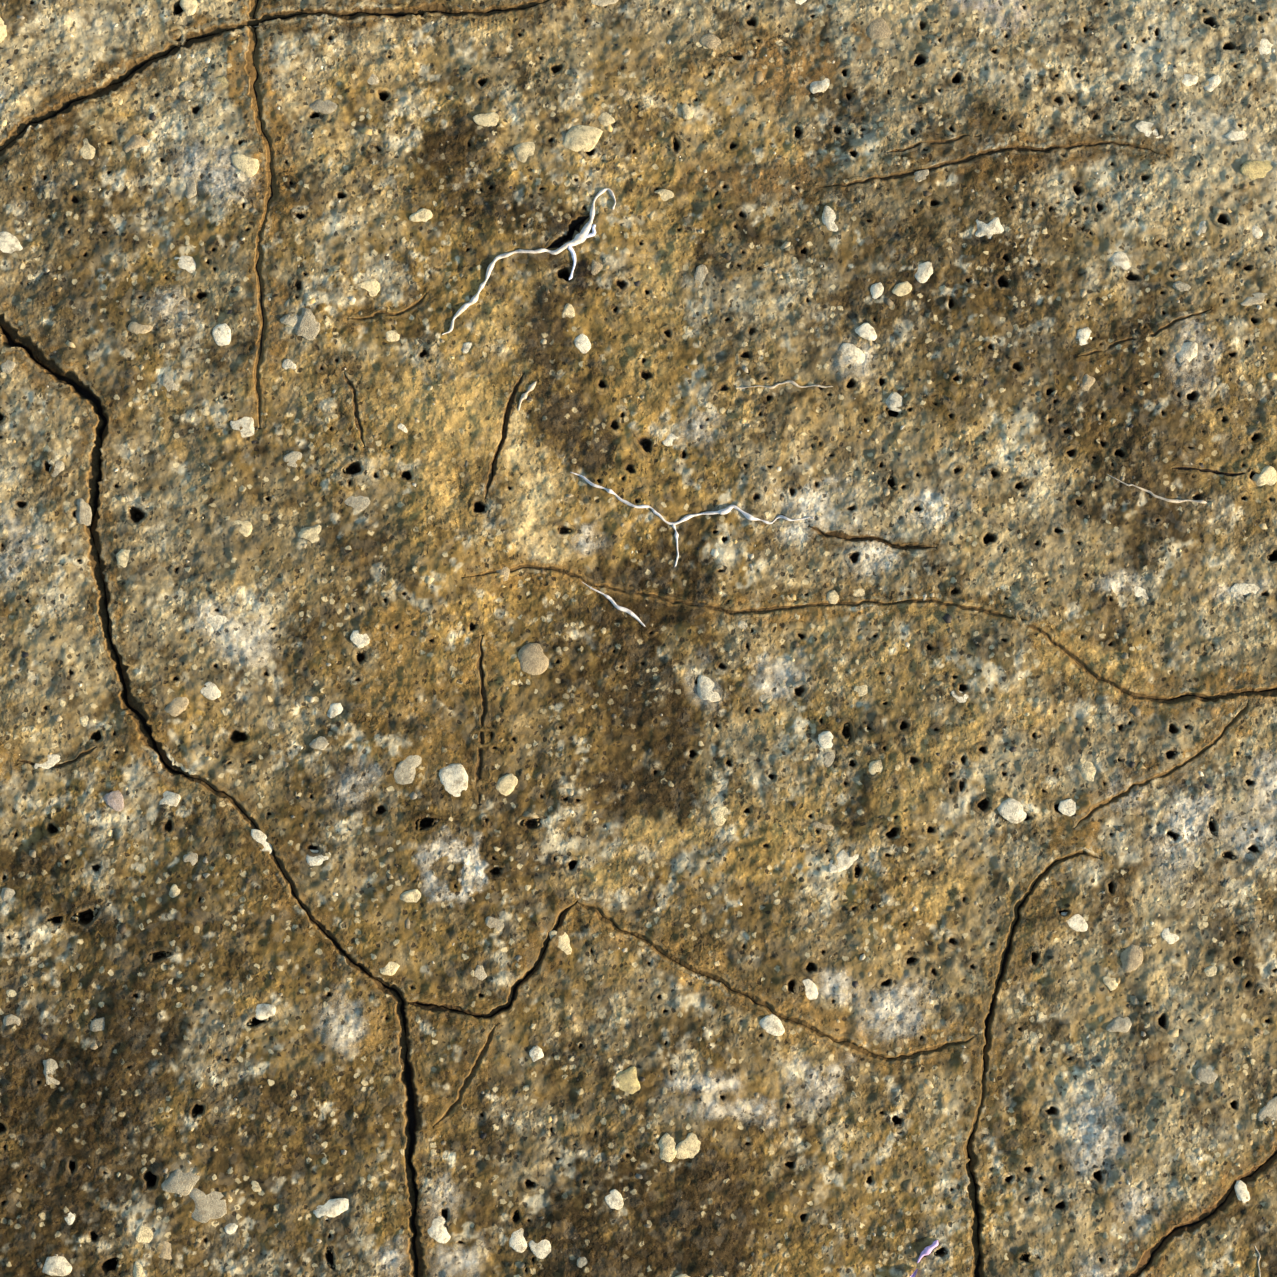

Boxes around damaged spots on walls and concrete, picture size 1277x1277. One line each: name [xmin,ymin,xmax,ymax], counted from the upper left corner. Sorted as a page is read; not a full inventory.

crack [0,0,569,438]
crack [538,211,590,257]
crack [0,283,1277,1277]